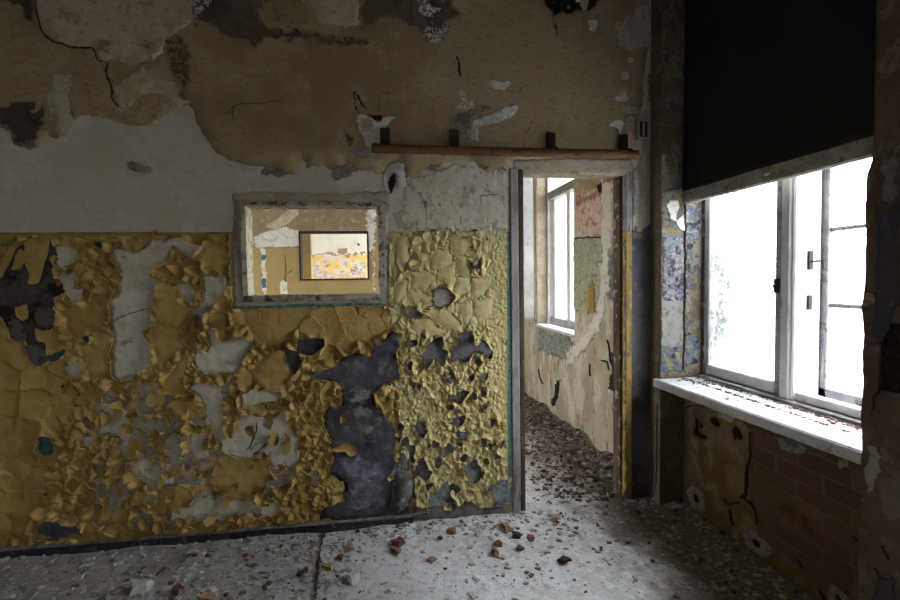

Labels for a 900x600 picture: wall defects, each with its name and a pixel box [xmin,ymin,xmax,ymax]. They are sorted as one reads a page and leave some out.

crack [35,0,119,107]
peeling [0,0,702,547]
crack [723,431,758,526]
flaking render [727,0,900,600]